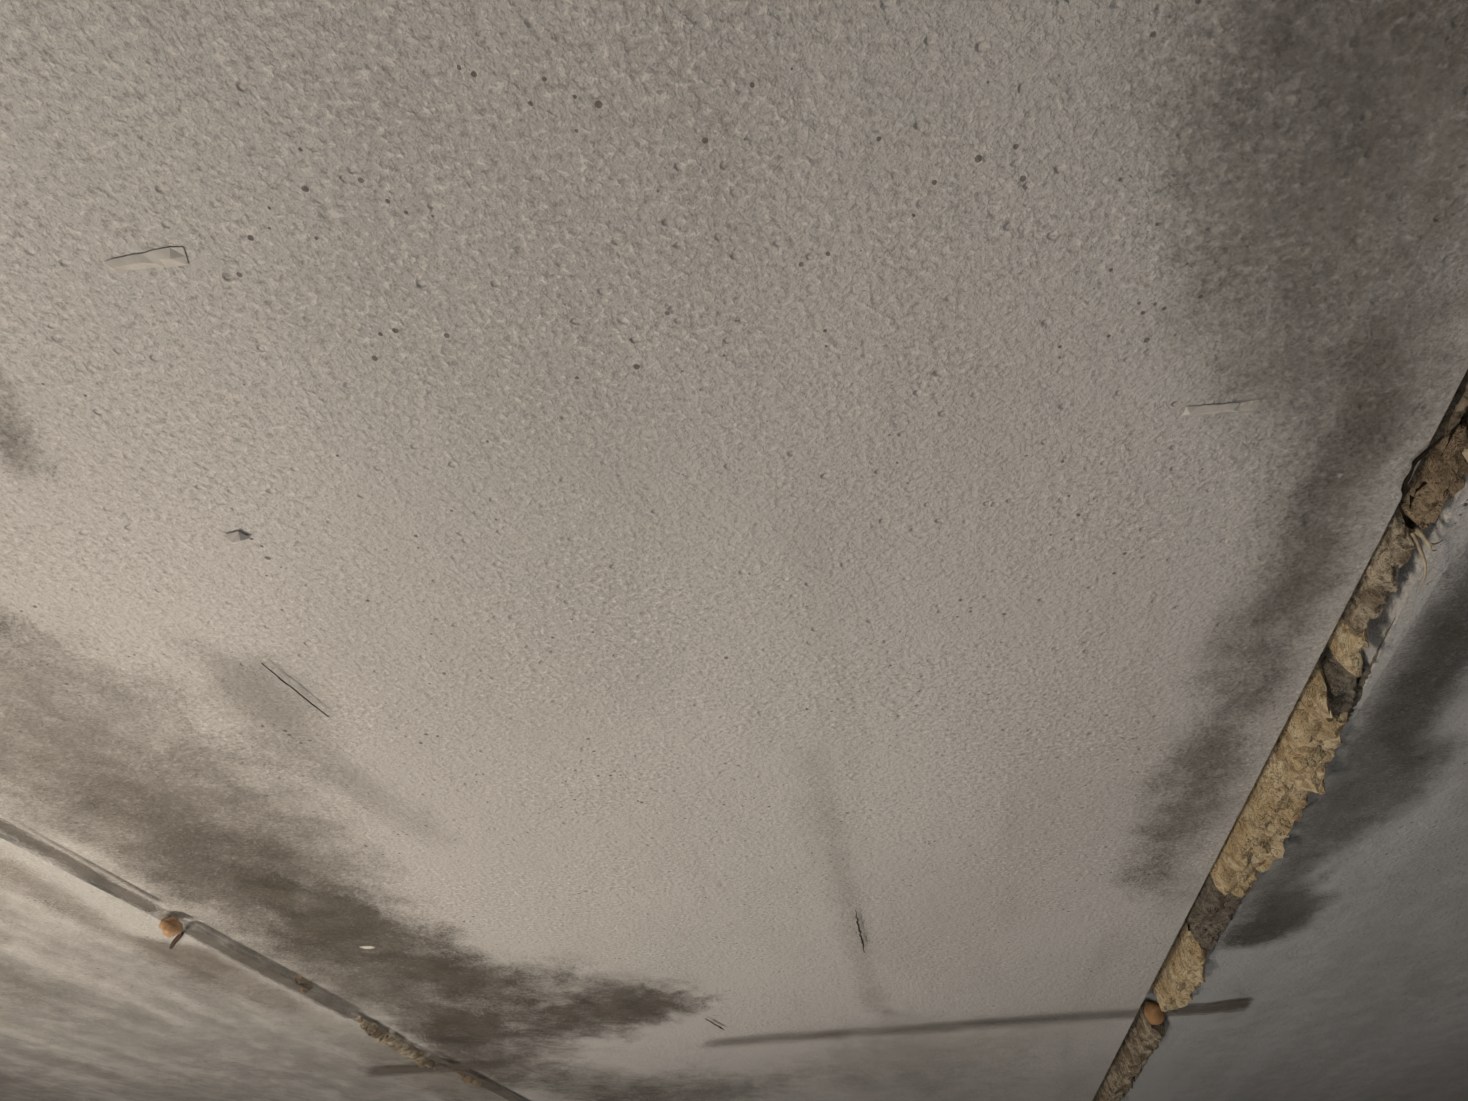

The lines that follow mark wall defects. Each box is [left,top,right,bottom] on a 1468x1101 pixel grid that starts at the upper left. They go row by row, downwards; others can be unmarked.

crack [261,663,329,717]
damp [1165,999,1250,1016]
damp [370,1062,503,1076]